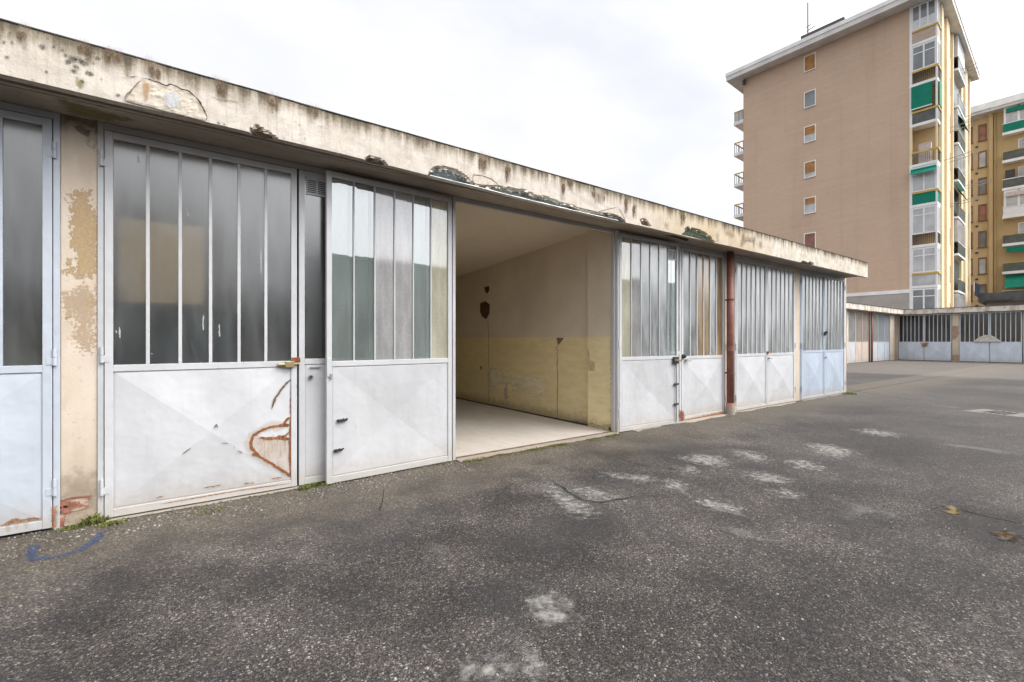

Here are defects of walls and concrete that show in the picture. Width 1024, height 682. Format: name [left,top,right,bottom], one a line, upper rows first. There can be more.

spalling [250,127,274,139]
spalling [428,166,625,222]
spalling [665,227,712,242]
peeling [60,188,98,356]
corrosion [157,379,291,504]
corrosion [0,506,57,528]